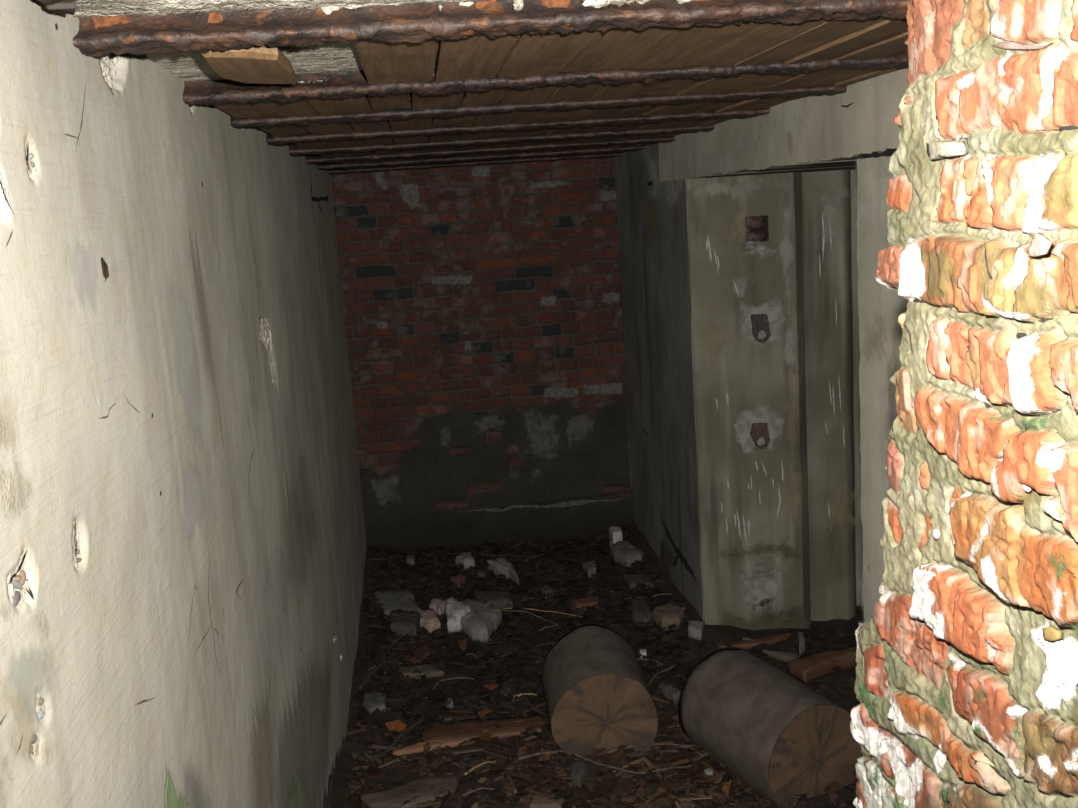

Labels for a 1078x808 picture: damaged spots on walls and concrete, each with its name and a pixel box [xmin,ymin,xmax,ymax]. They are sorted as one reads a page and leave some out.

rust [38,0,77,15]
rust [91,15,132,28]
rust [208,12,223,23]
rust [541,0,570,8]
water stain [876,239,926,302]
water stain [1006,333,1043,414]
spalling [6,550,34,612]
spalling [72,521,82,569]
water stain [909,564,952,639]
water stain [970,516,1009,602]
water stain [1031,591,1078,710]
water stain [850,697,947,808]